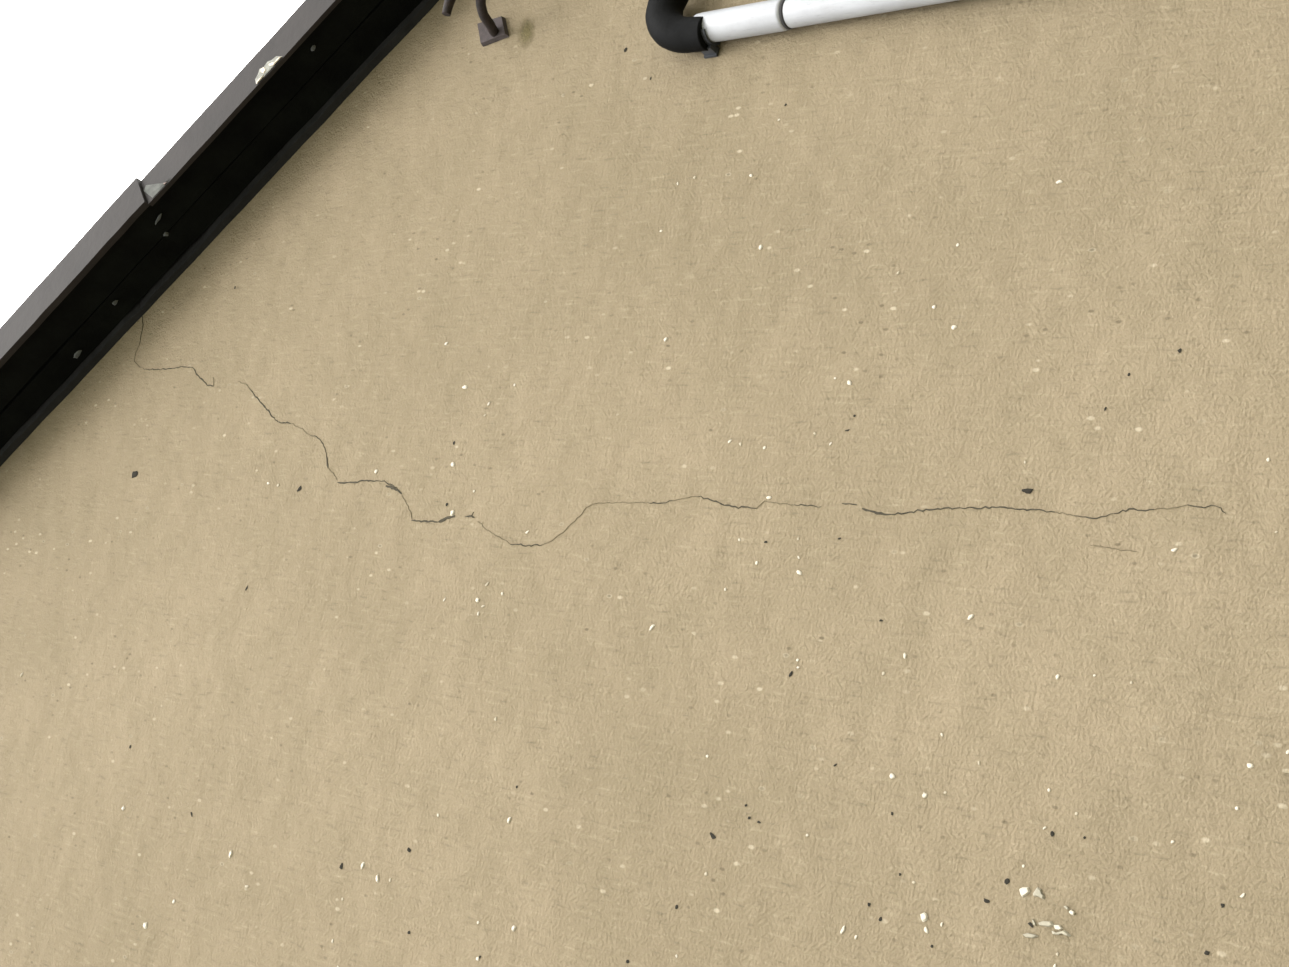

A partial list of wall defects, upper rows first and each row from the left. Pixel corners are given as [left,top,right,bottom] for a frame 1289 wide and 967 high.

crack [134,316,1225,552]